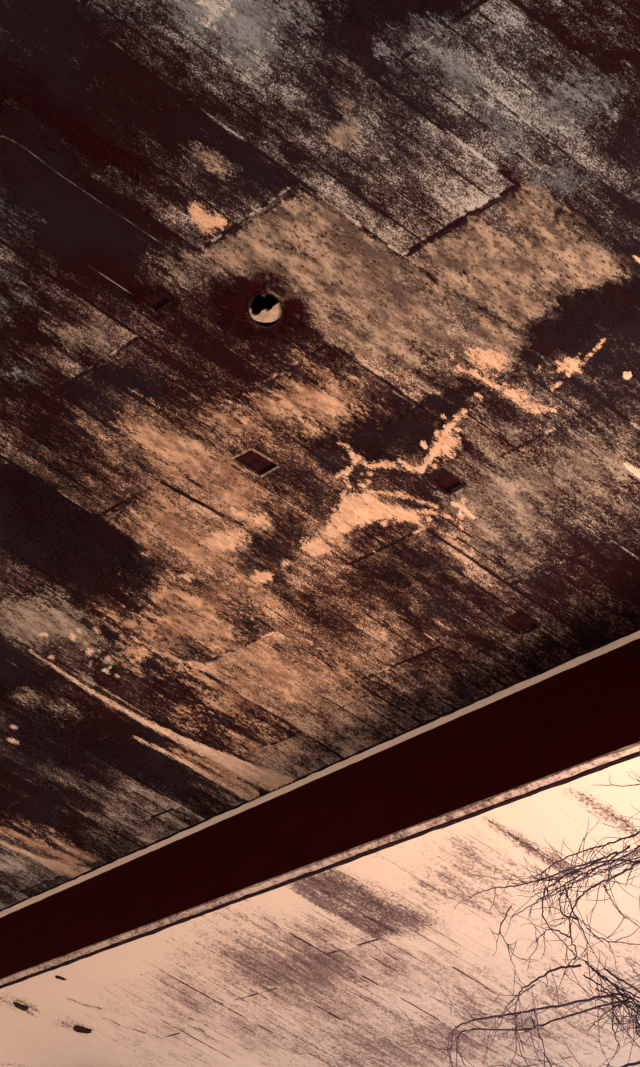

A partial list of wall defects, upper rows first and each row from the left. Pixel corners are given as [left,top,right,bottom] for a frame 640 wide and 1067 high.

damp [0,434,162,601]